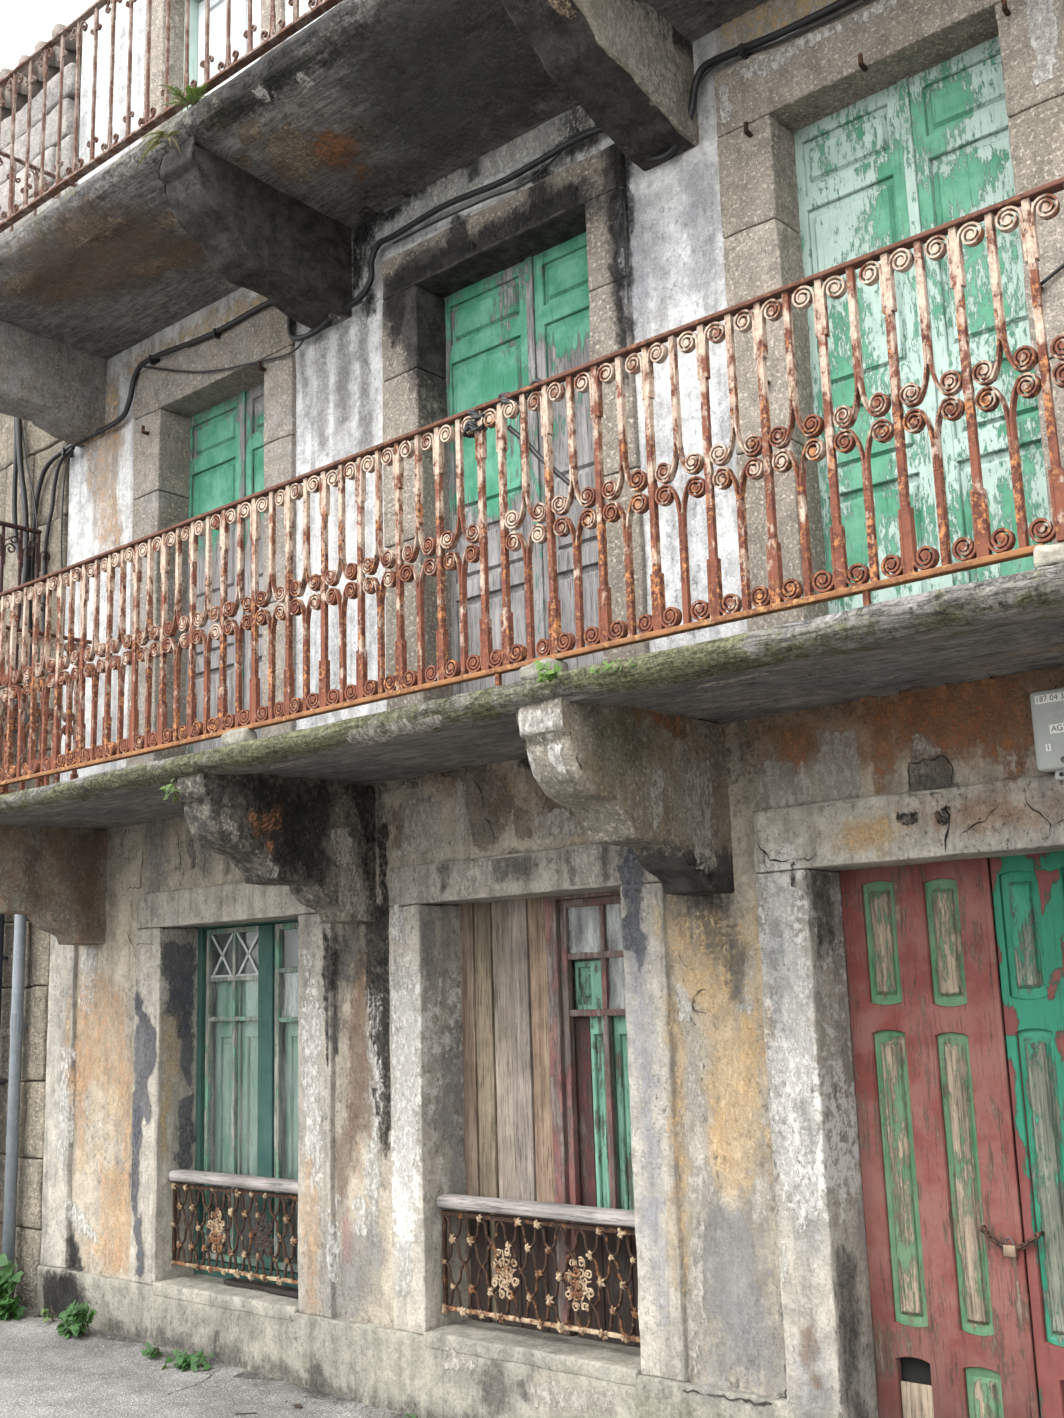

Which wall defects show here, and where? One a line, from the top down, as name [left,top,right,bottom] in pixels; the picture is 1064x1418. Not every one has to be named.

leakage [300,0,584,454]
corrosion [248,804,282,853]
leakage [346,715,442,748]
leakage [160,941,196,1170]
leakage [246,759,391,1320]